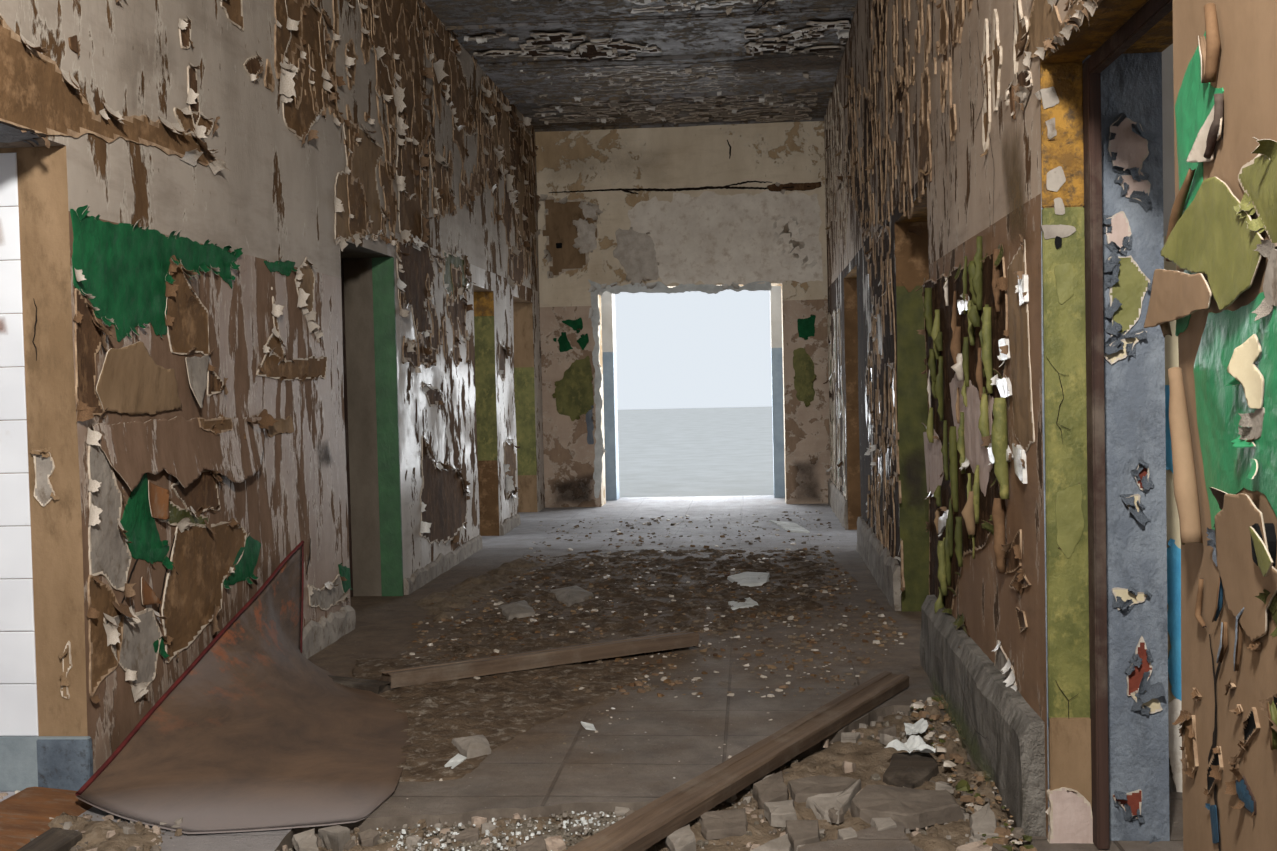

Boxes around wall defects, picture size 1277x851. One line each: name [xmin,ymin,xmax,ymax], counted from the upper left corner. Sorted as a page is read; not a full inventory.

peeling [0,13,230,175]
crack [549,140,822,194]
peeling [980,0,1103,157]
peeling [1102,3,1277,365]
peeling [1224,297,1273,479]
peeling [73,239,294,704]
peeling [991,640,1017,691]
peeling [1112,585,1152,613]
peeling [1120,458,1154,525]
peeling [1124,636,1166,715]
peeling [1172,688,1247,809]
peeling [1166,367,1277,717]